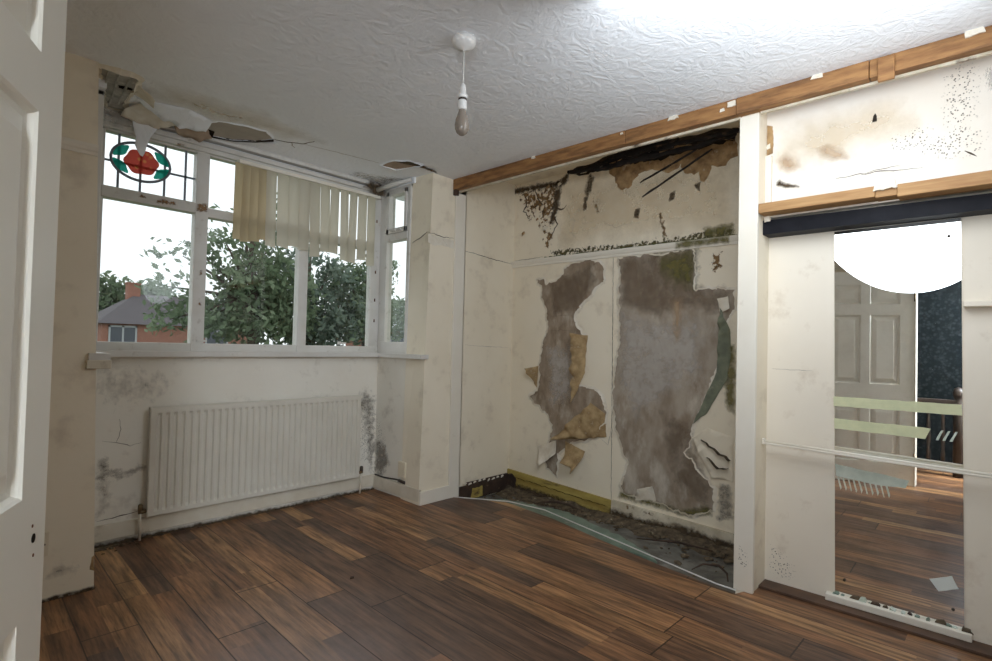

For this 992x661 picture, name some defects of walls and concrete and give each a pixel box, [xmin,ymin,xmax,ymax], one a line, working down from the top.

peeling [208,120,279,145]
flaking render [609,139,738,191]
damp [892,70,980,155]
peeling [515,174,568,248]
flaking render [528,249,737,519]
mould [360,393,387,472]
damp [94,487,374,548]